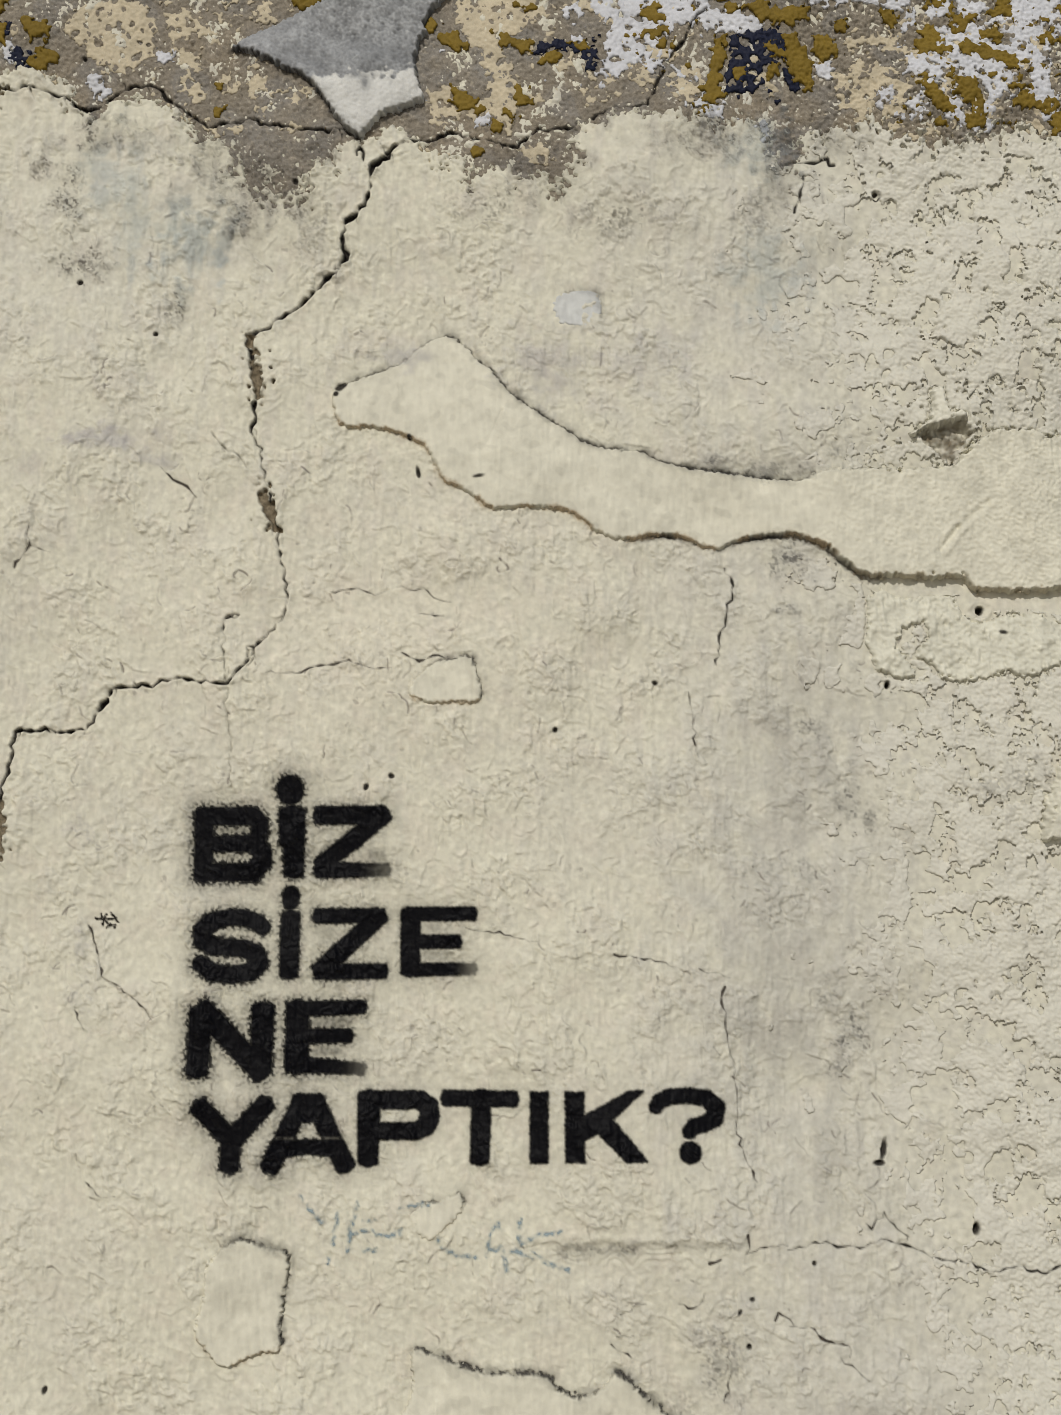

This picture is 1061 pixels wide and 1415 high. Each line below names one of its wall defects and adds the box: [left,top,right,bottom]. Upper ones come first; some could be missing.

flaking render [0,0,1061,469]
crack [0,8,707,802]
spalling [551,506,592,528]
spalling [629,533,714,549]
peeling [782,532,867,692]
peeling [967,609,1061,623]
crack [88,925,143,1007]
peeling [820,624,1061,1415]
crack [814,1224,1061,1274]